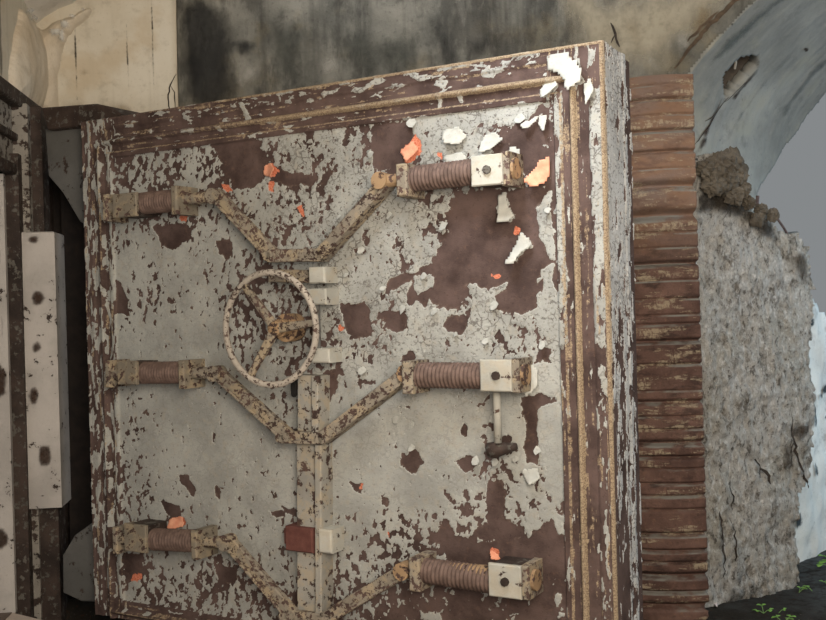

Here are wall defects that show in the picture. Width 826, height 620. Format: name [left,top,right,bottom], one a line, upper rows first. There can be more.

damp [184,2,231,103]
peeling [540,52,594,104]
peeling [514,113,547,131]
peeling [400,141,418,162]
peeling [442,126,503,162]
peeling [524,157,550,187]
peeling [496,188,516,222]
spalling [695,146,780,236]
peeling [505,233,531,264]
crack [791,417,809,488]
crack [754,459,771,484]
crack [719,486,738,577]